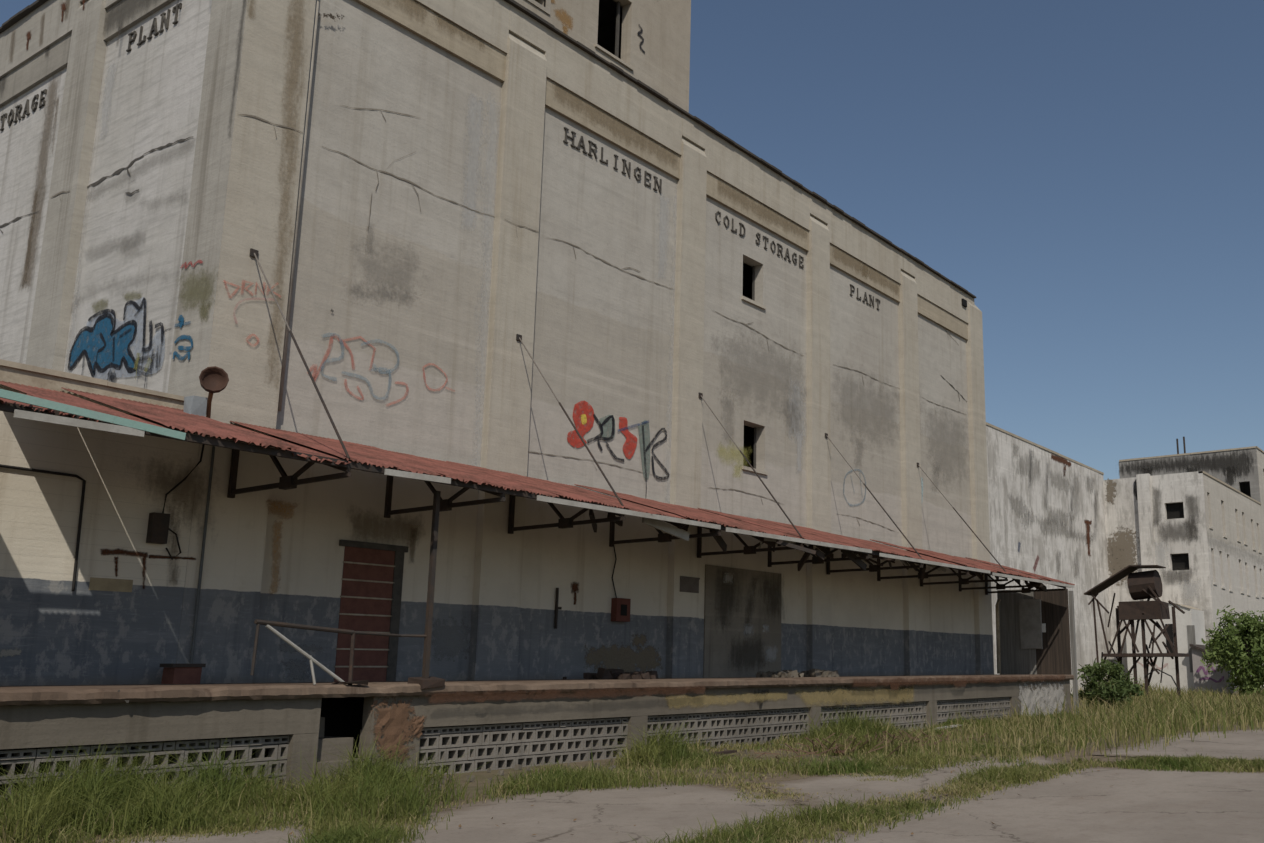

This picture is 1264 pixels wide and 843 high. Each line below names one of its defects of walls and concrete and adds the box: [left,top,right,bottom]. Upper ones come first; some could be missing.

corrosion [551,0,572,34]
crack [342,105,419,121]
crack [0,136,194,234]
crack [240,114,673,289]